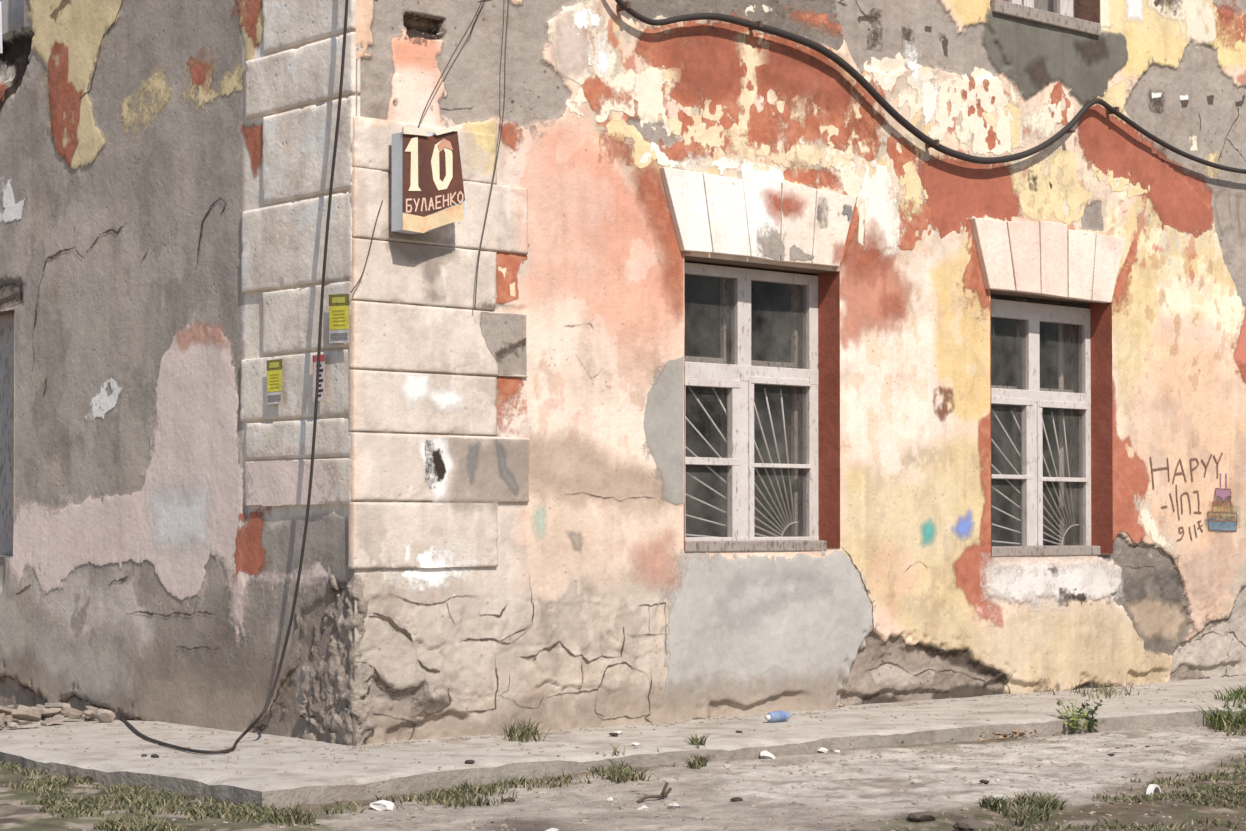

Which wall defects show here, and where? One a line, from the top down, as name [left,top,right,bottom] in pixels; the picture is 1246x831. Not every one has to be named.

peeling [0,177,25,223]
peeling [0,0,123,169]
peeling [120,0,264,135]
crack [197,198,226,264]
peeling [241,125,263,176]
spalling [356,0,1246,383]
spalling [477,244,529,437]
peeling [0,313,447,746]
peeling [978,413,991,545]
spalling [1098,379,1246,682]
crack [357,575,667,740]
spalling [839,632,1007,706]